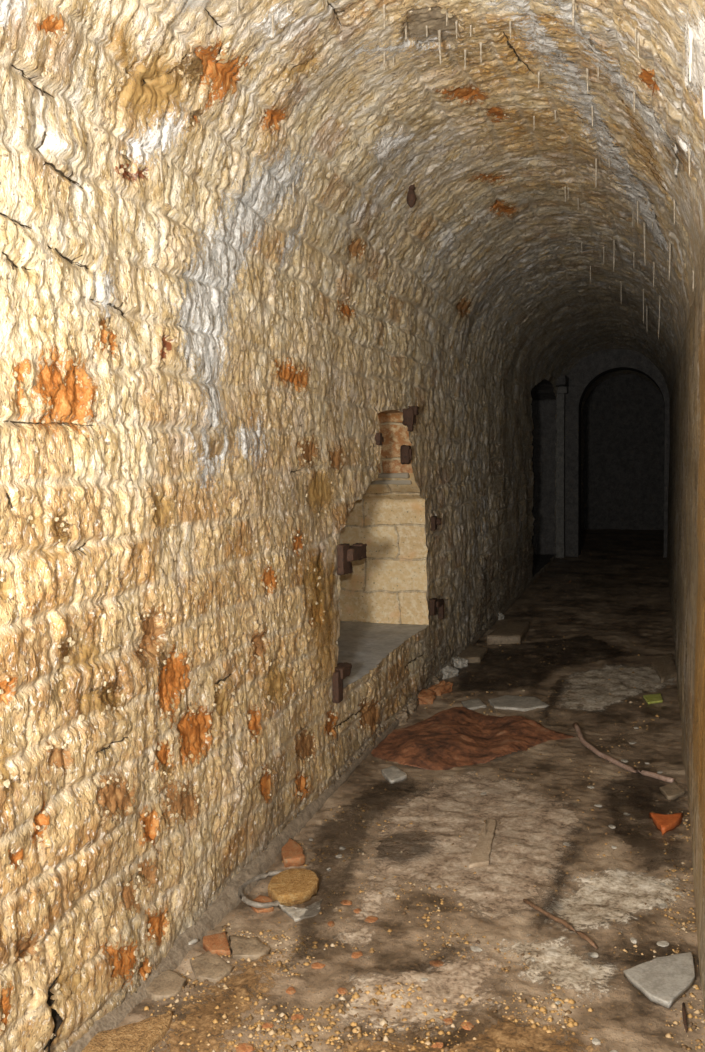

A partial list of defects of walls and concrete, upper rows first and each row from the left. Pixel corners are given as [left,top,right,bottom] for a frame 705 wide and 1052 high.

crack [11,64,54,98]
crack [503,32,534,74]
crack [35,132,83,189]
crack [0,213,88,270]
damp [167,140,316,488]
crack [44,977,63,1052]